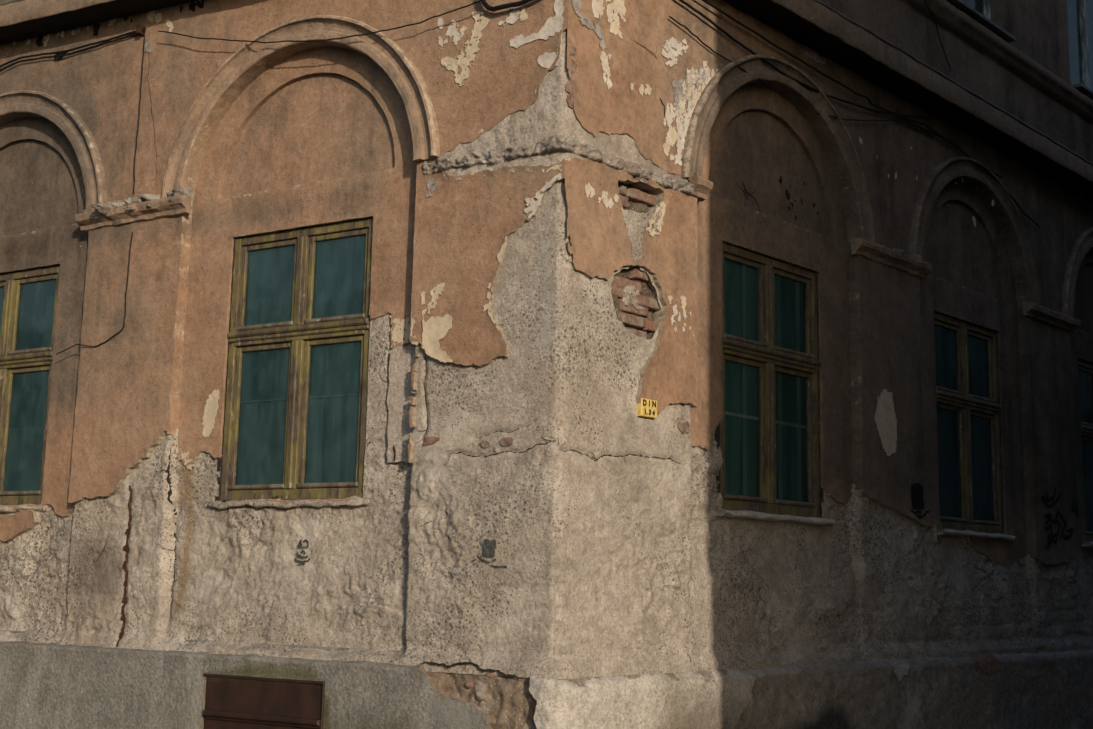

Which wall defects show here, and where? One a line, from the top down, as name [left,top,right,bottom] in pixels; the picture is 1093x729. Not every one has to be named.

peeling [437,0,528,86]
peeling [509,0,564,48]
peeling [572,0,626,89]
peeling [661,37,689,67]
flaking render [442,30,674,181]
peeling [663,61,719,166]
flaking render [0,173,1093,729]